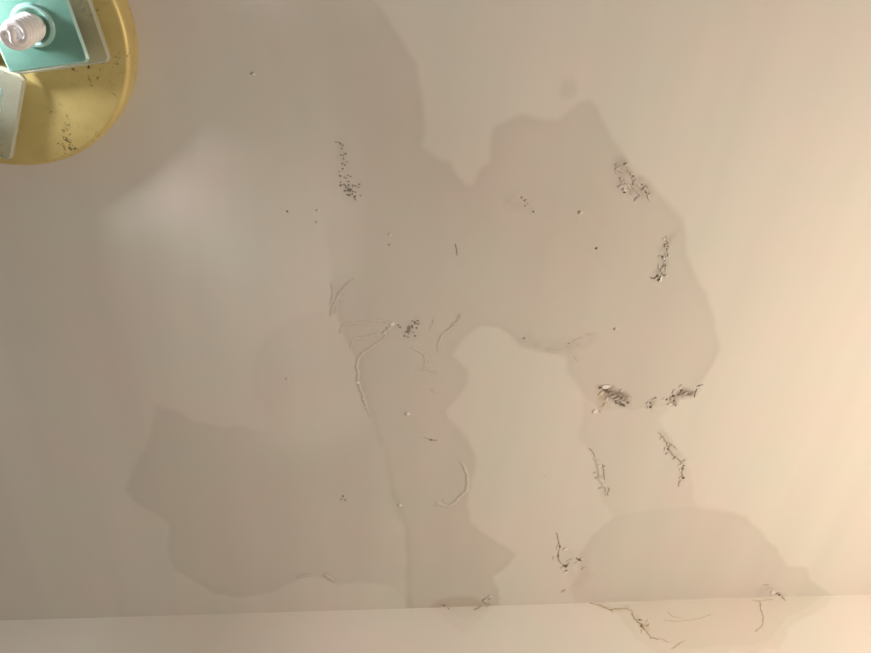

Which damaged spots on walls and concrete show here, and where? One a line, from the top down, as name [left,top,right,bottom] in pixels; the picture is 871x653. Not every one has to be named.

peeling [650,235,671,282]
spalling [593,385,631,413]
spalling [647,385,701,408]
crack [589,448,610,496]
crack [659,433,686,487]
crack [553,533,586,593]
crack [590,603,709,649]